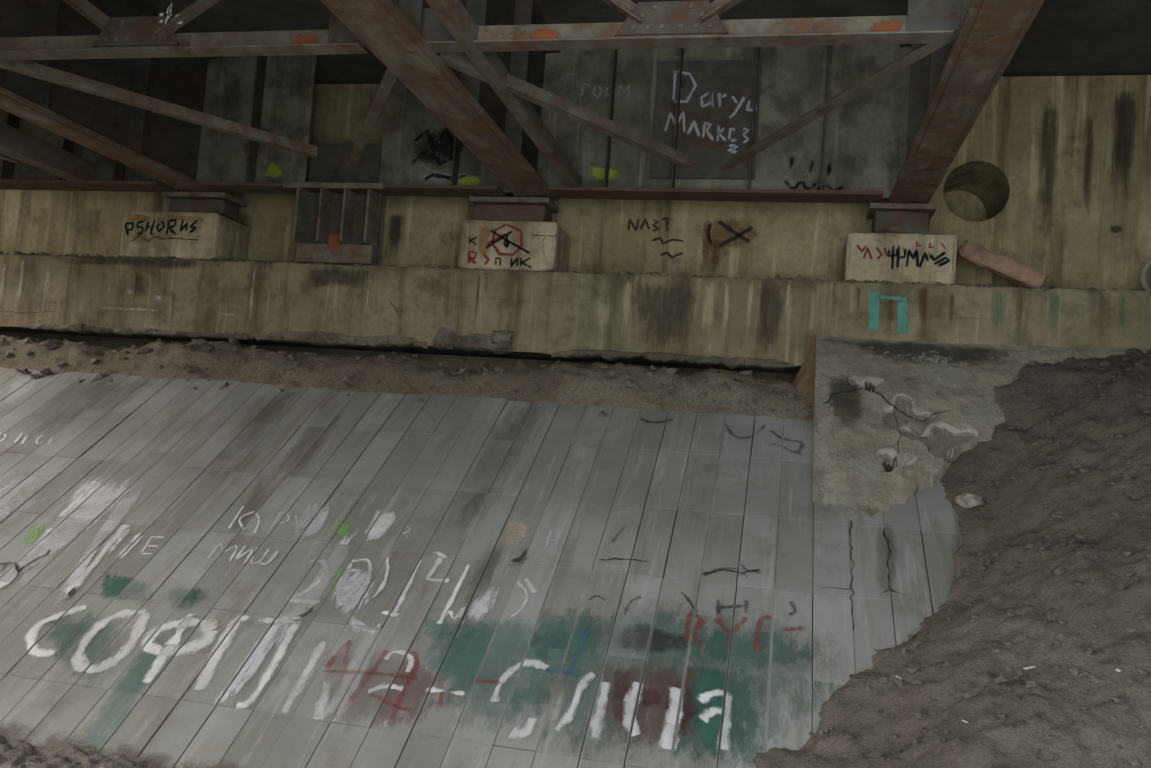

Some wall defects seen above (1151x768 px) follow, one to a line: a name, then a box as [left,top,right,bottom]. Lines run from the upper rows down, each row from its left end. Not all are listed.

water stain [703,283,729,327]
water stain [747,285,790,339]
spalling [847,376,884,392]
crack [824,388,948,467]
spalling [876,393,979,472]
crack [825,520,855,630]
crack [883,529,904,595]